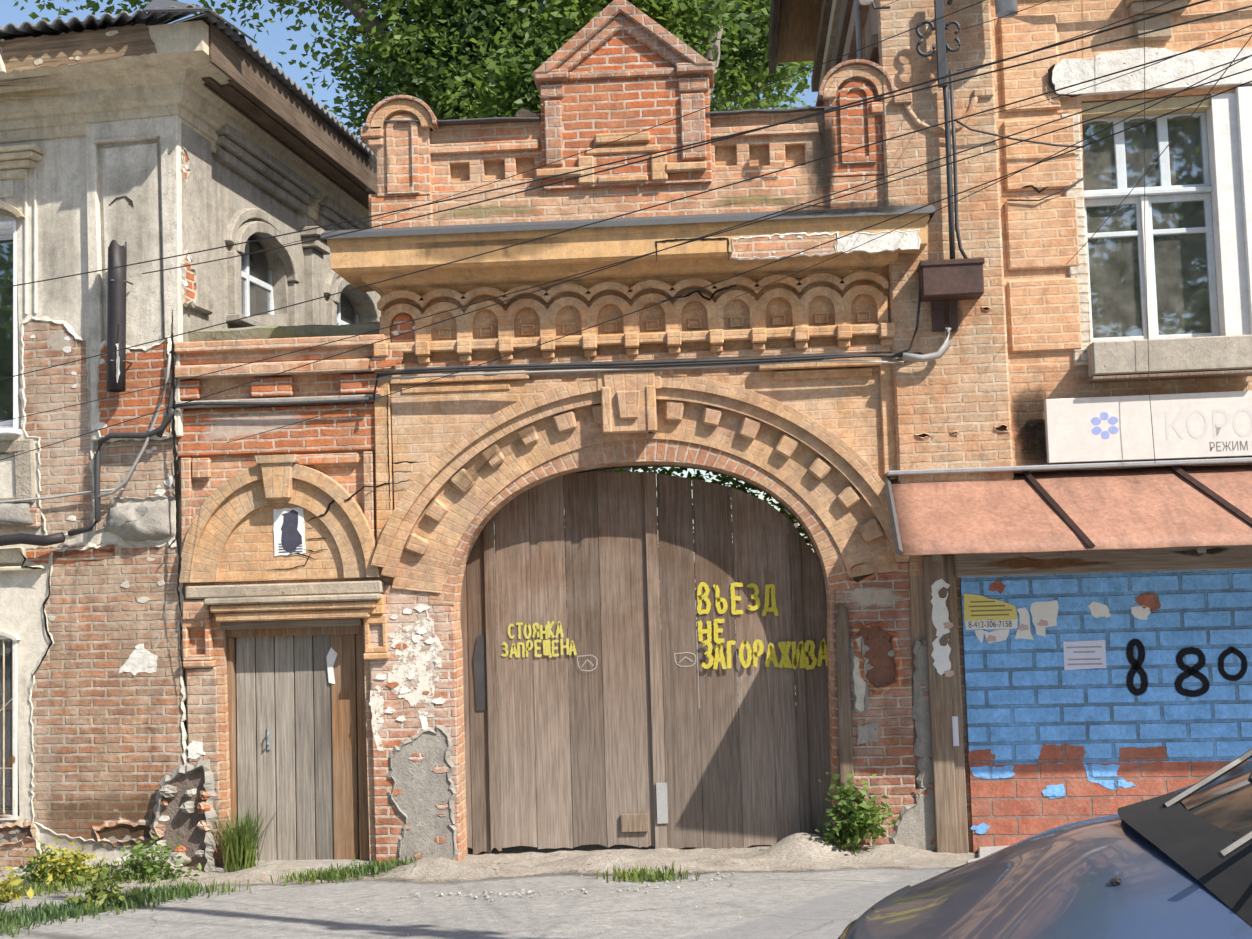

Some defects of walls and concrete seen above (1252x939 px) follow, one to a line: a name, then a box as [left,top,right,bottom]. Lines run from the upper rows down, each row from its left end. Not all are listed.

damp [788,122,897,215]
crack [269,392,418,571]
spalling [0,315,217,872]
peeling [369,604,458,864]
spalling [849,620,934,844]
peeling [970,823,990,834]
peeling [968,749,1015,780]
peeling [1042,784,1066,799]
peeling [1037,743,1169,790]